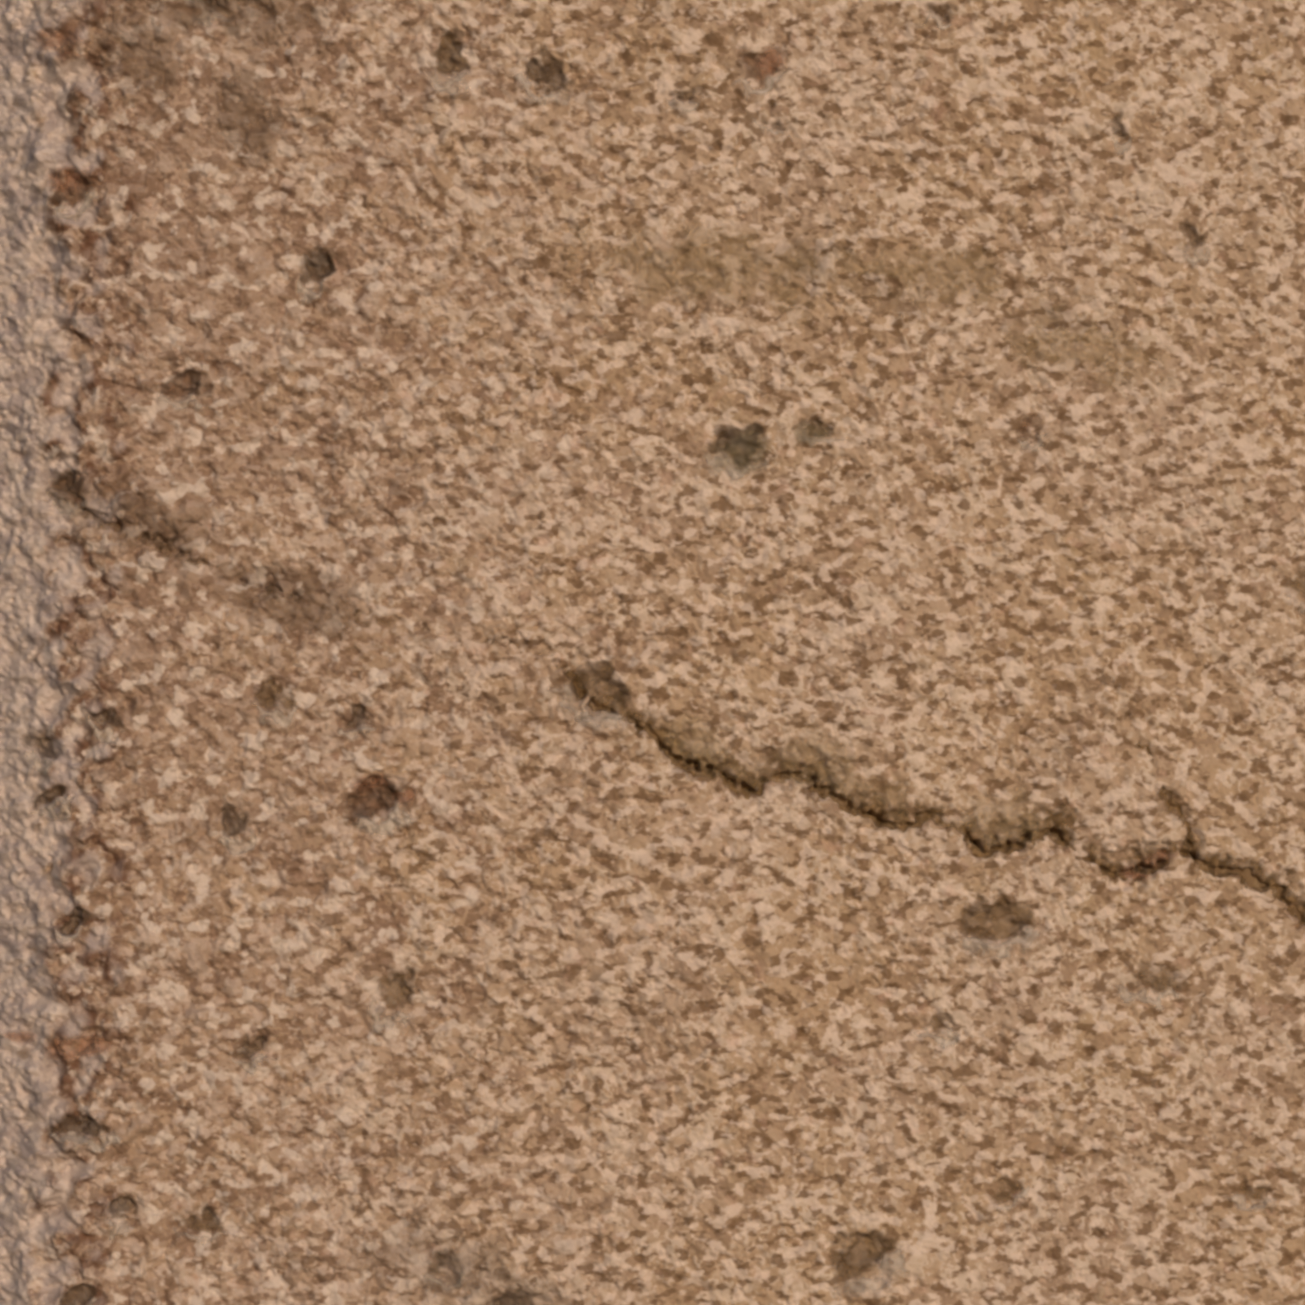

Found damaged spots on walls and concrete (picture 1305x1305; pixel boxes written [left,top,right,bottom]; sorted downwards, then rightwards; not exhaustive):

crack [556,665,1305,925]